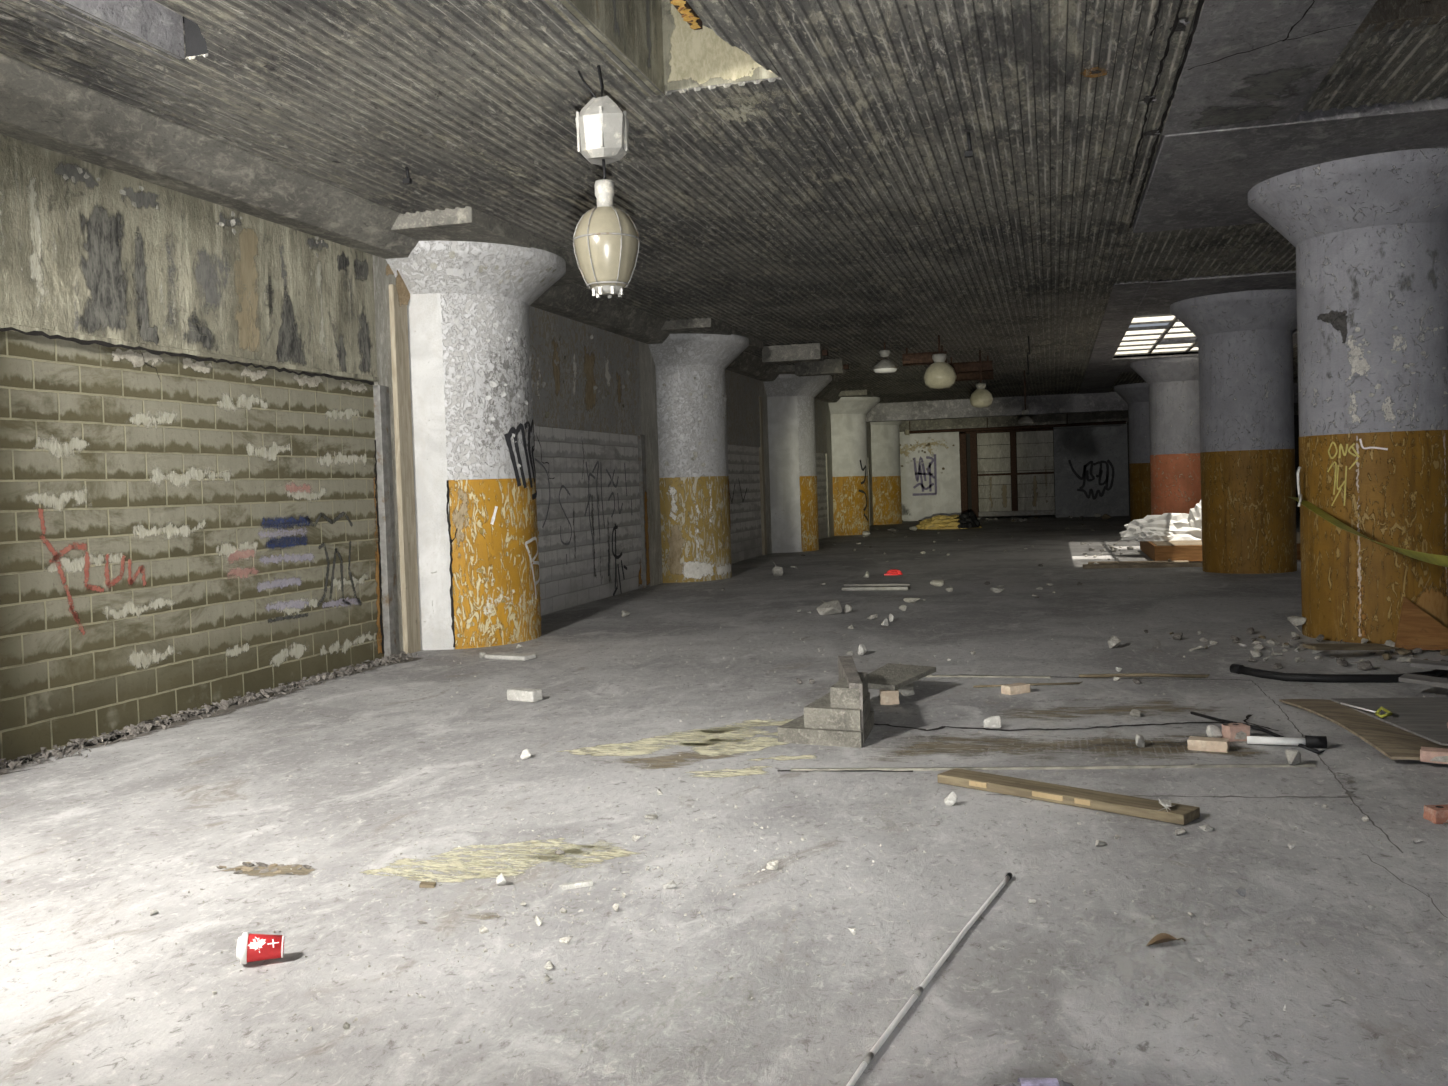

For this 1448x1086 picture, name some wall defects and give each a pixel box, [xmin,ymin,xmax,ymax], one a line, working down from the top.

spalling [667,4,785,104]
water stain [0,172,56,309]
water stain [75,205,230,351]
water stain [264,246,371,373]
water stain [26,489,86,511]
water stain [48,554,122,573]
water stain [105,599,172,619]
water stain [133,520,206,538]
water stain [270,633,376,667]
peeling [452,486,542,638]
crack [841,767,913,775]
crack [874,679,1448,918]